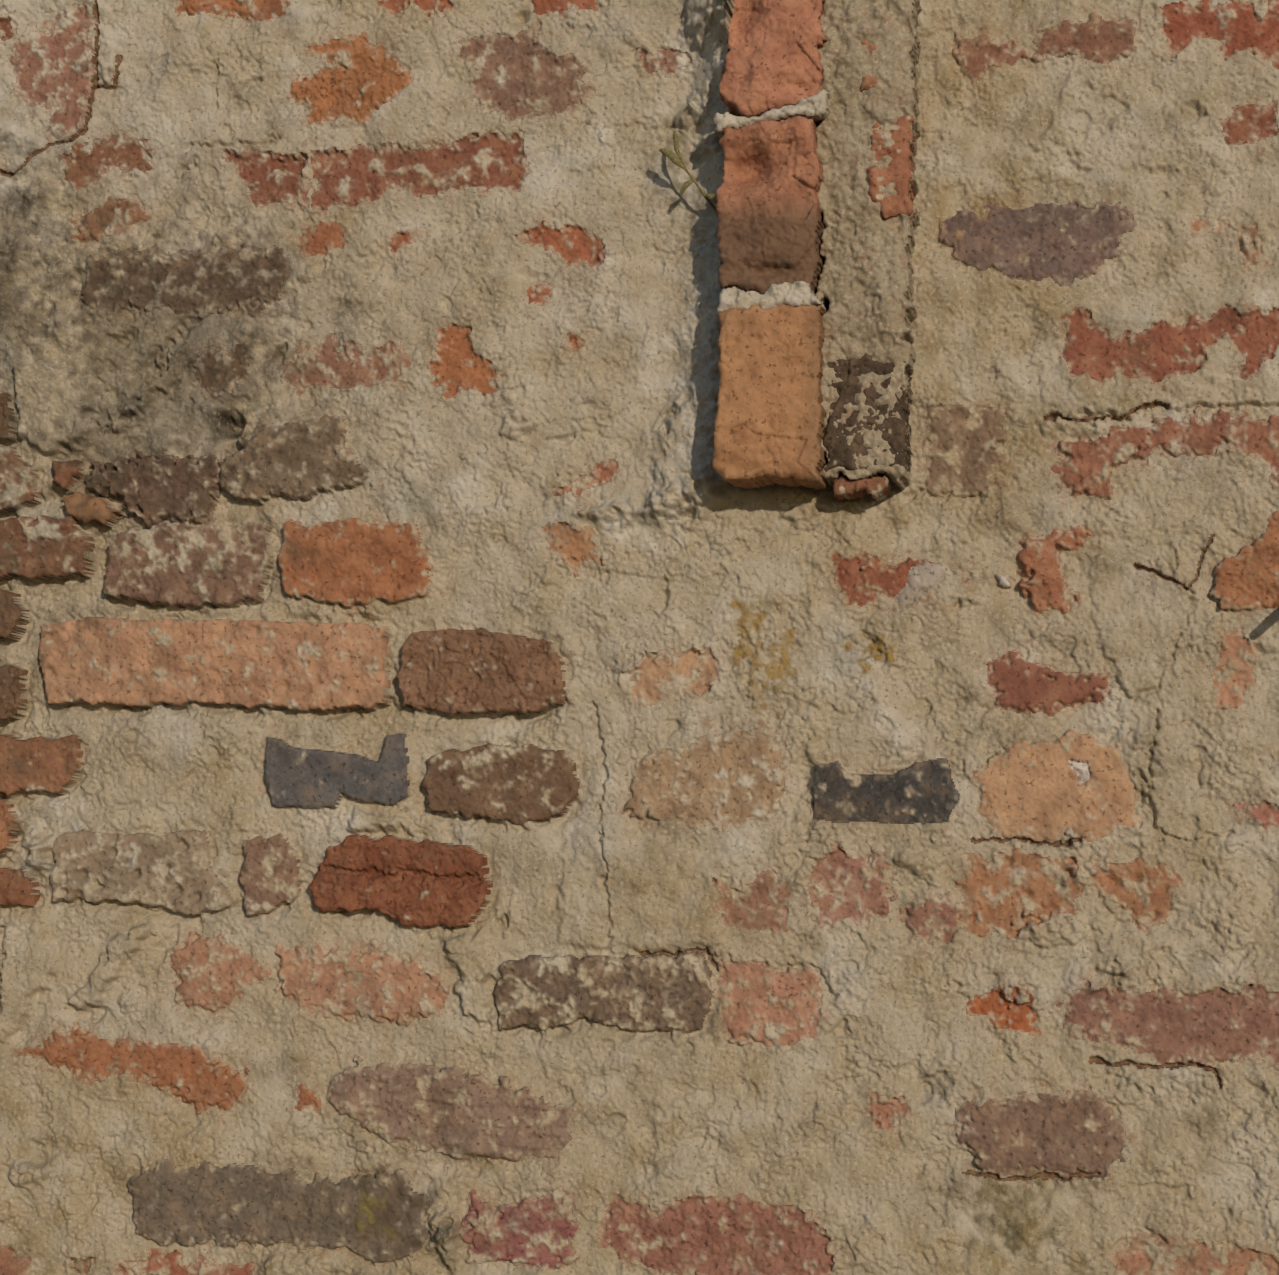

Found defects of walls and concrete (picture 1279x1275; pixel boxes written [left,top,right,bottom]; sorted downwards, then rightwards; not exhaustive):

crack [0,0,123,178]
spalling [194,344,251,399]
spalling [280,333,411,396]
spalling [428,322,504,400]
spalling [567,331,585,351]
crack [1044,400,1170,422]
spalling [551,459,620,497]
spalling [540,522,603,578]
spalling [0,392,580,928]
spalling [169,931,450,1027]
spalling [494,952,824,1047]
crack [1088,1055,1223,1089]